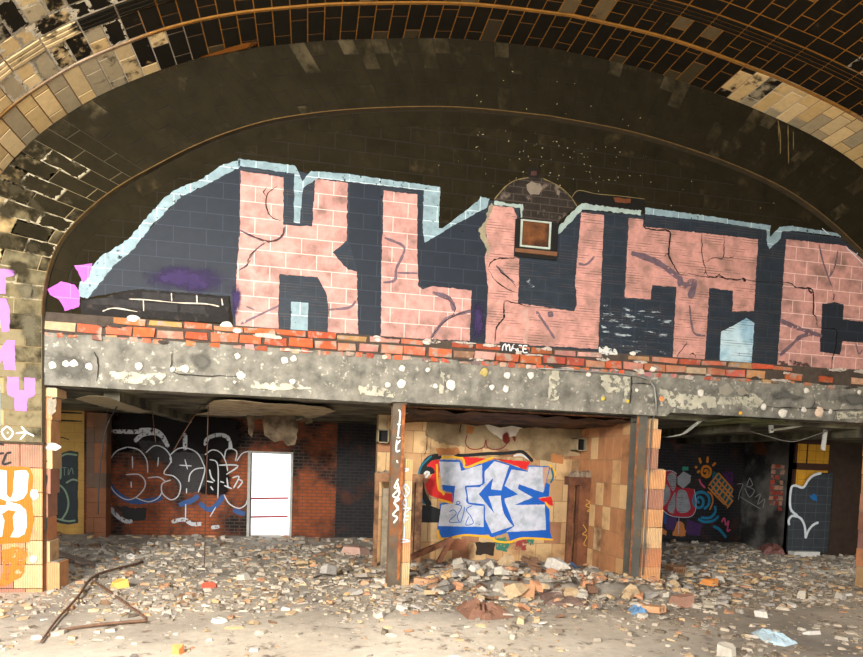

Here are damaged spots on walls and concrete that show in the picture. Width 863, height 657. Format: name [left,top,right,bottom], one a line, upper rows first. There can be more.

damp [0,149,90,300]
crack [631,213,863,368]
flaking render [44,289,863,410]
damp [22,367,39,381]
flaking render [196,399,335,446]
flaking render [684,418,787,427]
flaking render [836,411,863,420]